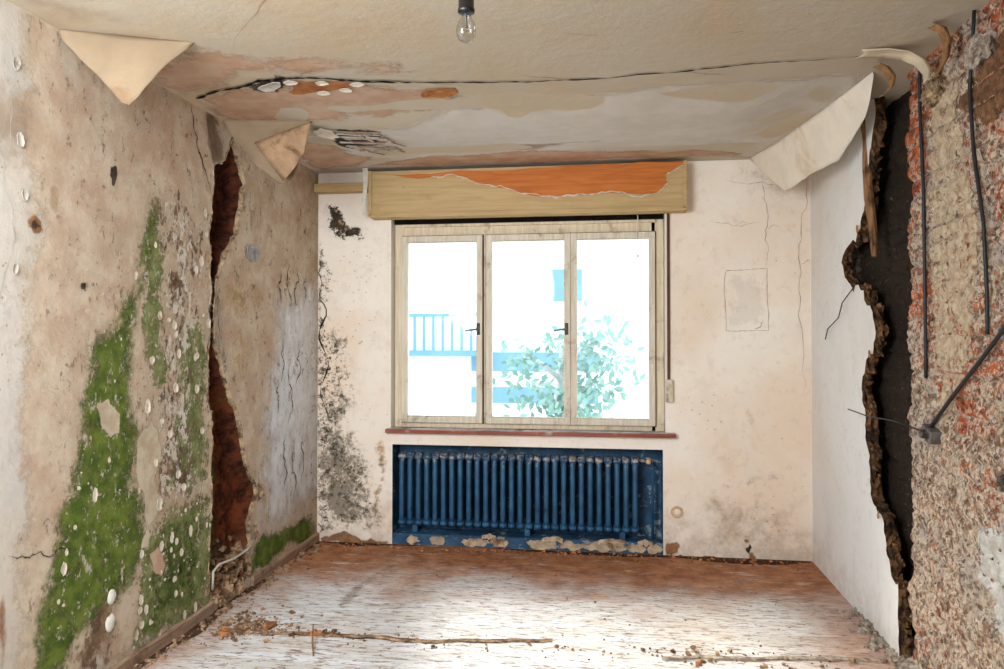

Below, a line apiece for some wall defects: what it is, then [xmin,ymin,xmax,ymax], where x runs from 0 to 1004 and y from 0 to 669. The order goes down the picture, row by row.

peeling [854,22,952,83]
spalling [868,62,896,212]
spalling [327,205,363,240]
crack [279,266,306,307]
water stain [35,198,211,669]
water stain [251,245,387,572]
spalling [842,206,914,657]
peeling [150,534,169,586]
peeling [406,535,445,546]
peeling [460,533,508,548]
peeling [526,536,663,554]